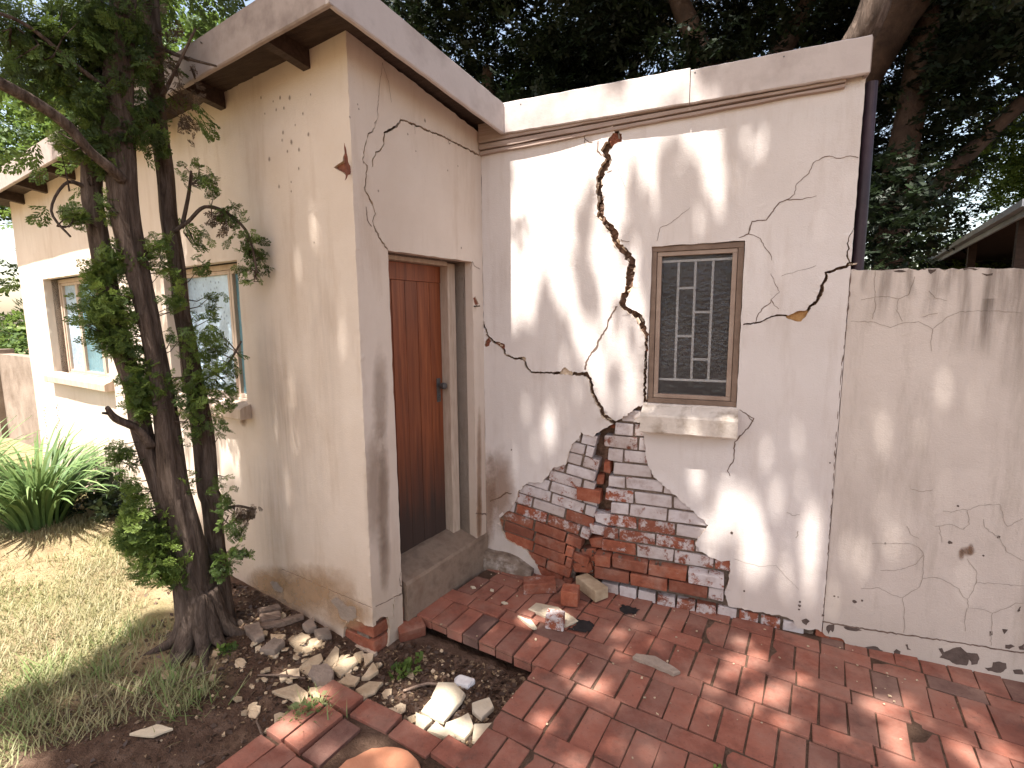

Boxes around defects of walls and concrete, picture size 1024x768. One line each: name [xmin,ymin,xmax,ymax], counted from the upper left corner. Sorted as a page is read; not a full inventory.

crack [368,62,474,154]
spalling [337,143,351,180]
crack [473,131,649,425]
crack [739,156,1024,653]
spalling [500,410,862,643]
leakage [254,573,361,624]
spalling [270,617,388,698]
peeling [939,647,1024,675]